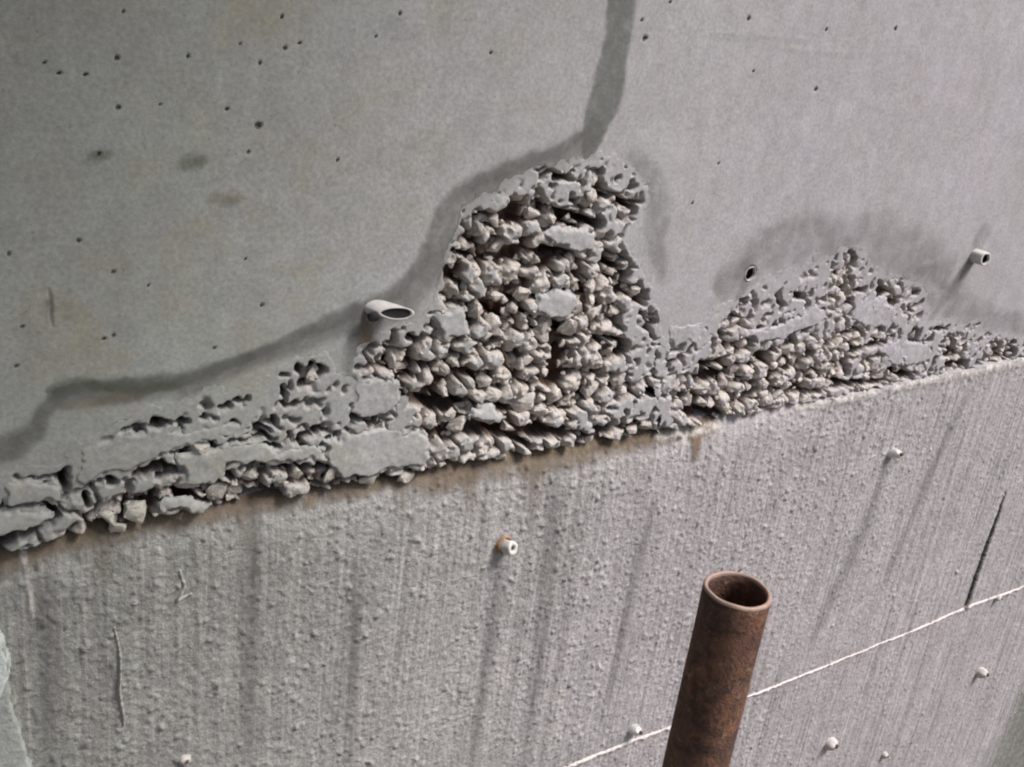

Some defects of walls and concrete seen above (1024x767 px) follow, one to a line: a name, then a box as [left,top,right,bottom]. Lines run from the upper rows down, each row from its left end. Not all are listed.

damp [577,0,634,158]
flaking render [523,199,571,229]
flaking render [448,272,627,399]
damp [55,345,277,399]
flaking render [439,355,459,376]
flaking render [705,328,891,408]
flaking render [444,371,560,432]
flaking render [626,419,652,434]
flaking render [205,462,262,501]
flaking render [288,463,336,483]
flaking render [99,499,146,533]
crack [964,506,1000,609]